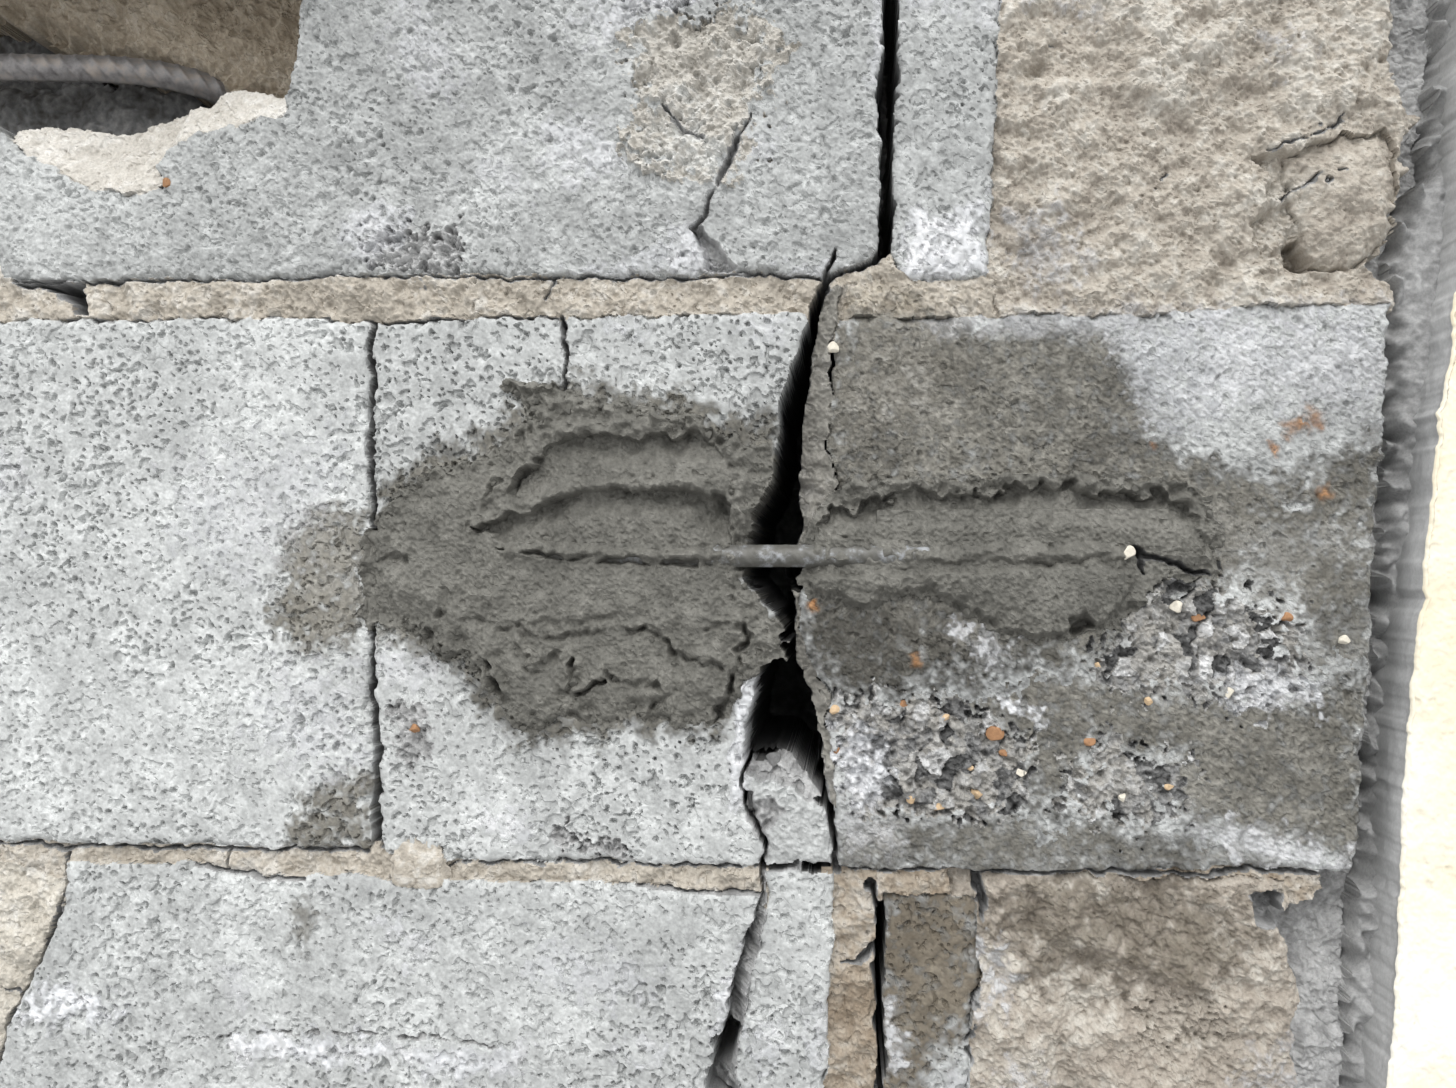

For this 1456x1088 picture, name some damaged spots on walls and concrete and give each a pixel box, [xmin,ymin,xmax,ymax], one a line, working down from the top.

crack [1268,113,1350,203]
crack [11,0,901,545]
water stain [556,369,786,471]
water stain [264,394,766,810]
water stain [801,186,1384,1088]
crack [1131,544,1212,576]
water stain [288,766,382,849]
water stain [474,805,531,840]
crack [448,567,1319,1088]
crack [192,1027,496,1050]